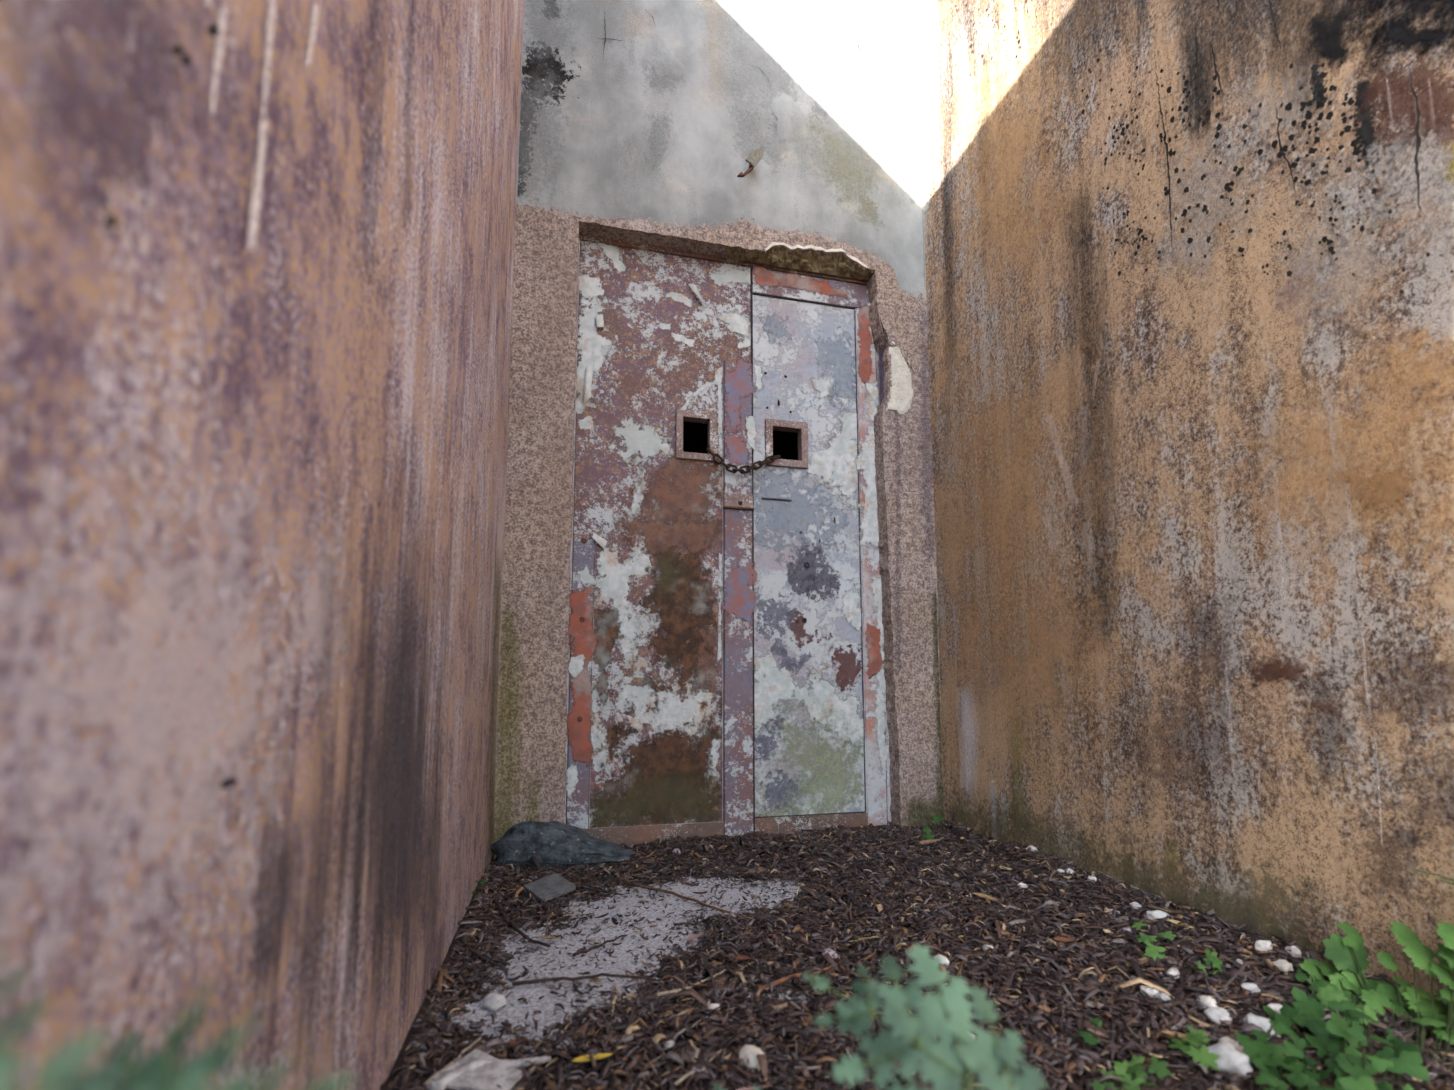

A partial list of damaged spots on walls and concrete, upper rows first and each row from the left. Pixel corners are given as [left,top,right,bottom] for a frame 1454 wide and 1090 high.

damp [517,0,581,200]
damp [1027,0,1120,74]
damp [1181,0,1454,167]
peeling [565,242,914,813]
corrosion [590,445,723,828]